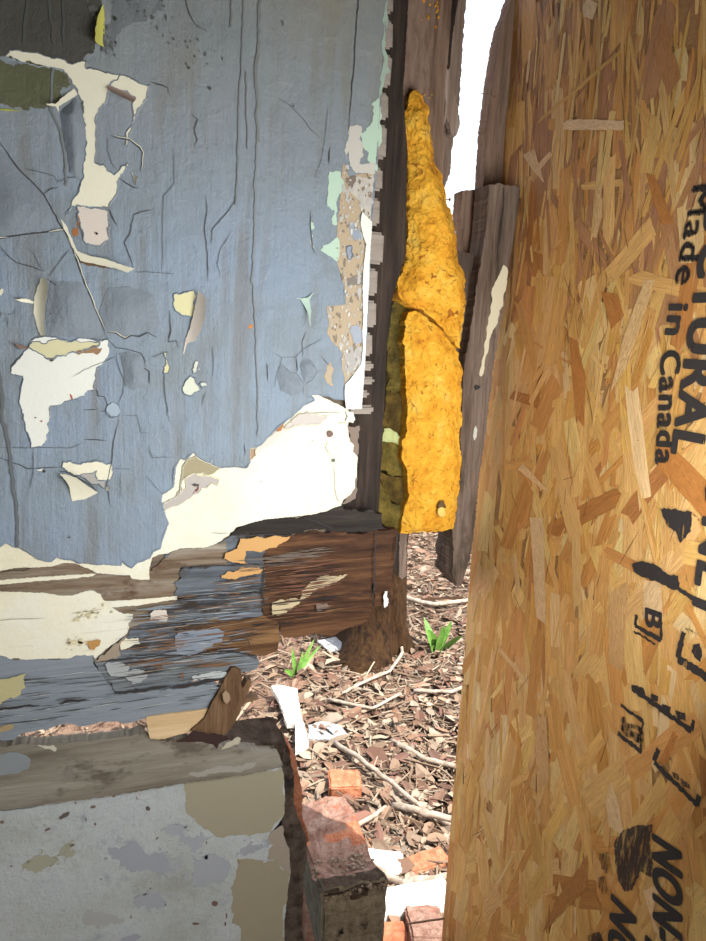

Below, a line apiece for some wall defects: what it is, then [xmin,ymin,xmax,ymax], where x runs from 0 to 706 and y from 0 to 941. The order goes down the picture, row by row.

damp [0,371,20,547]
peeling [11,337,109,447]
peeling [7,51,148,246]
crack [0,136,179,506]
damp [0,0,223,187]
crack [194,199,235,276]
damp [230,0,262,437]
crack [282,0,359,177]
peeling [310,0,390,455]
peeling [0,536,290,732]
peeling [272,574,347,615]
spalling [184,717,291,941]